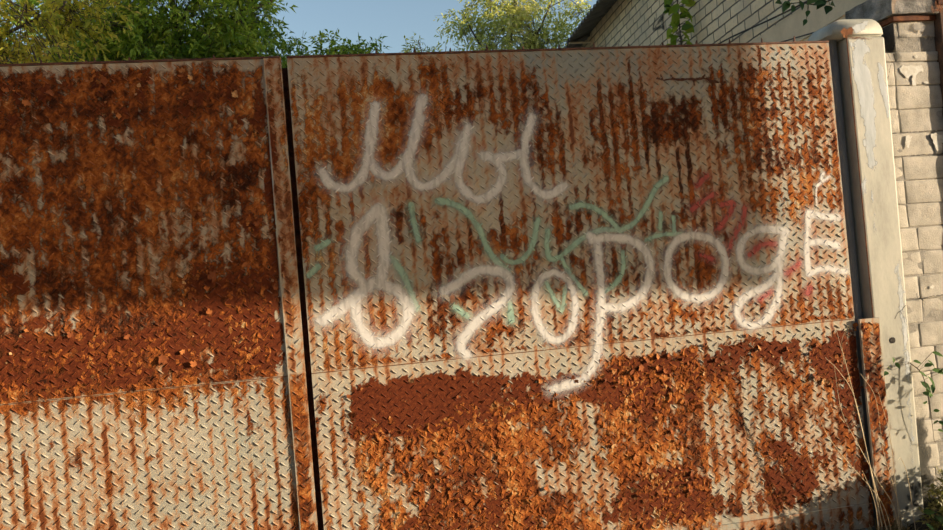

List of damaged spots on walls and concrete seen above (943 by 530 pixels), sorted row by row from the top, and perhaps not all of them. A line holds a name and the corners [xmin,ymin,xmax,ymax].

corrosion [0,61,604,530]
corrosion [286,45,843,375]
corrosion [584,274,894,530]
peeling [849,21,889,199]